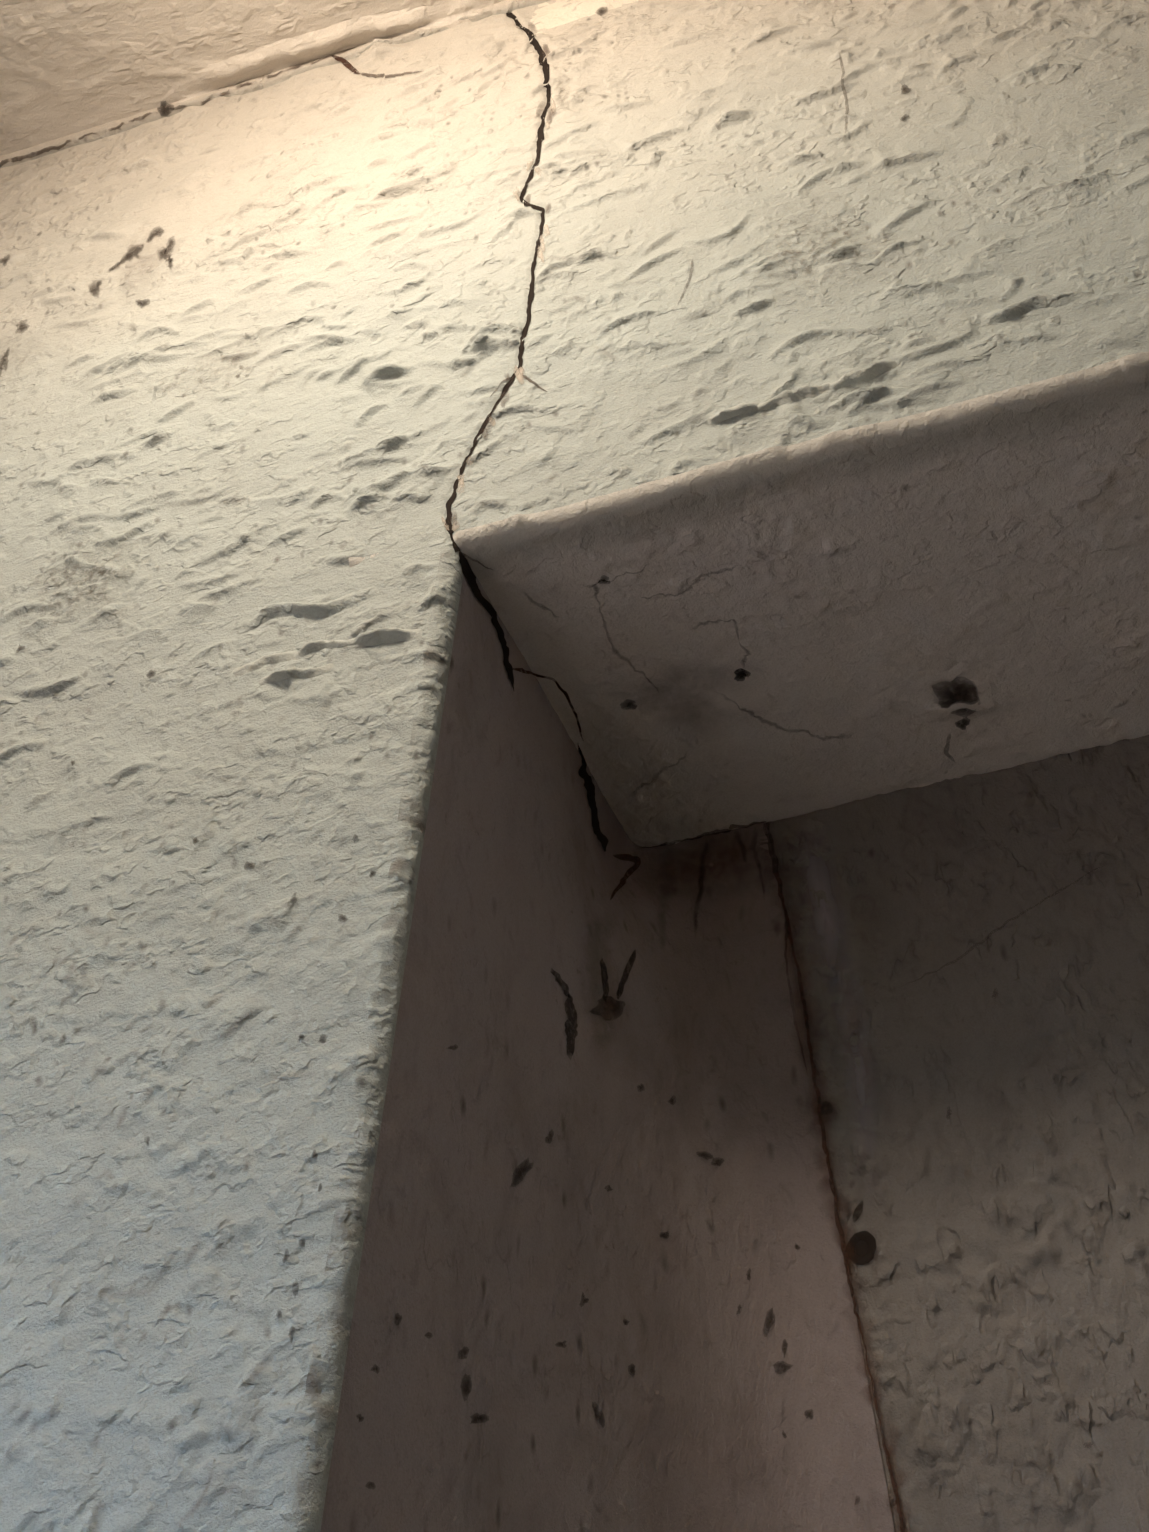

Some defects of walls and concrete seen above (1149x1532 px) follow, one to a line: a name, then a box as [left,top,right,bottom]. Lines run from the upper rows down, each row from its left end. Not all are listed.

crack [442,13,641,900]
spalling [908,654,1004,730]